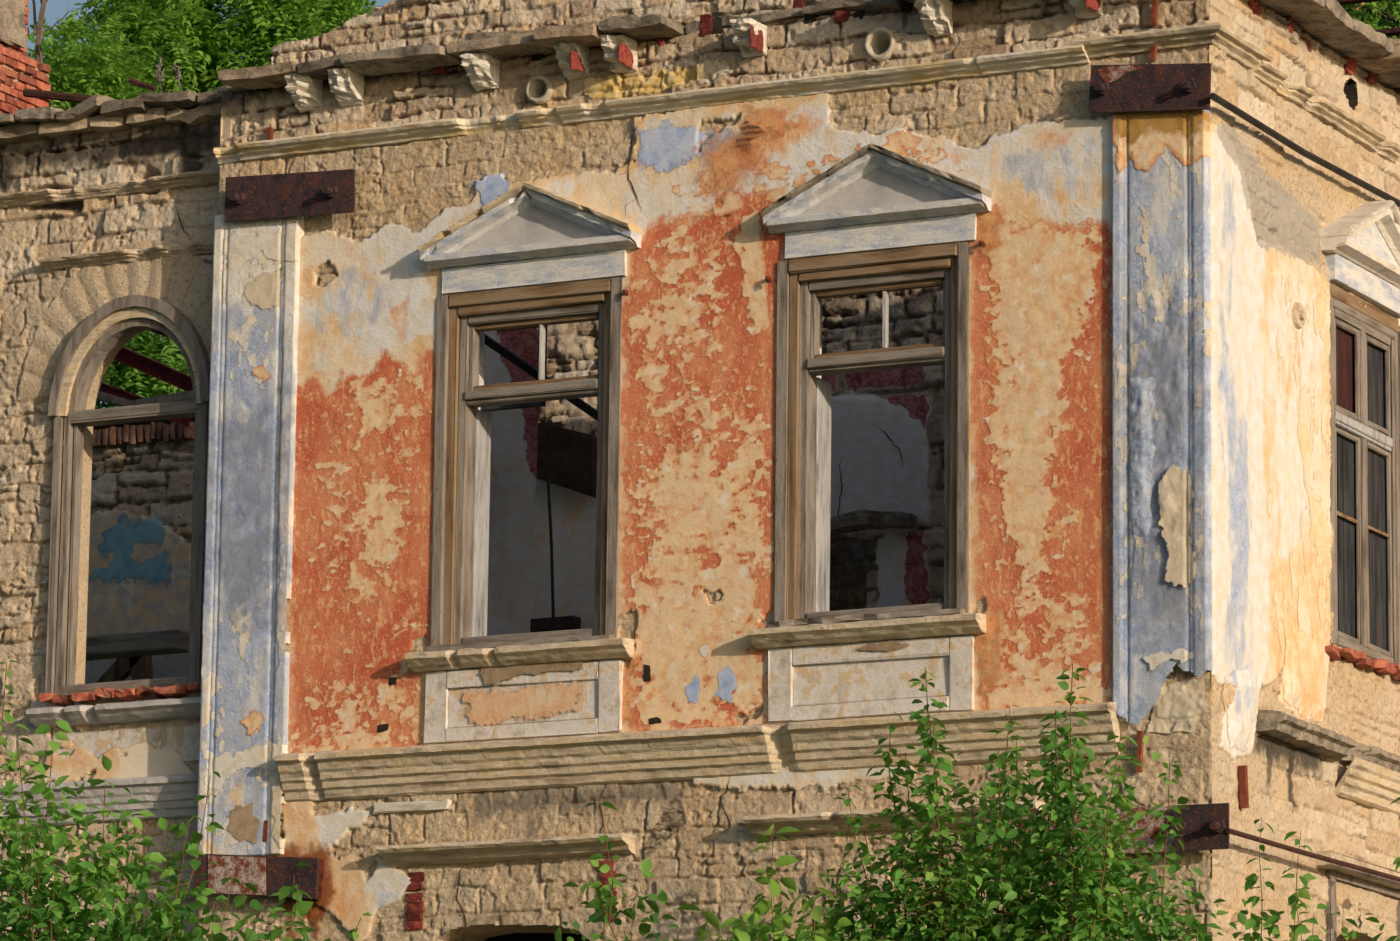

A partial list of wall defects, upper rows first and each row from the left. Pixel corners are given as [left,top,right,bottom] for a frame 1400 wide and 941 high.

peeling [200,365,433,855]
peeling [213,55,1211,734]
spalling [361,736,1131,941]
spalling [1304,659,1400,756]